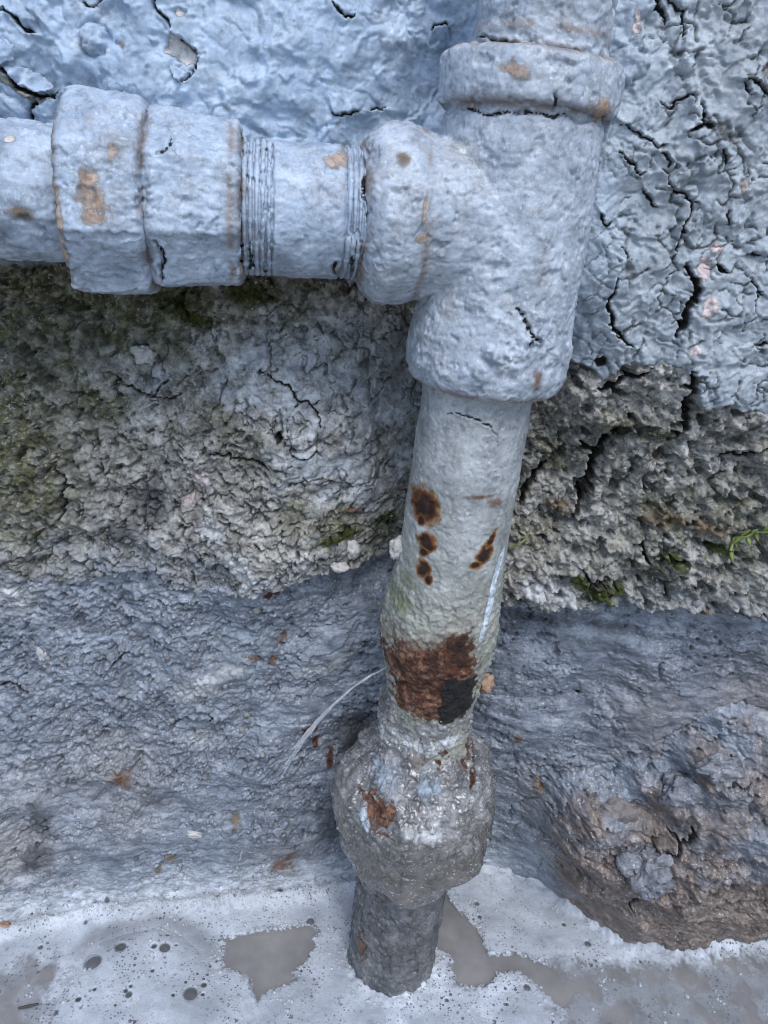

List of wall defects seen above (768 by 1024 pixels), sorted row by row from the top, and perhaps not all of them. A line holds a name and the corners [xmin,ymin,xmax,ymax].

spalling [165,8,200,82]
crack [661,93,728,164]
crack [618,124,727,337]
crack [597,281,648,391]
peeling [182,469,212,510]
crack [571,428,617,518]
peeling [190,518,274,590]
rust [411,483,441,585]
rust [469,528,497,570]
peeling [518,579,579,611]
rust [379,623,481,722]
rust [360,788,397,837]